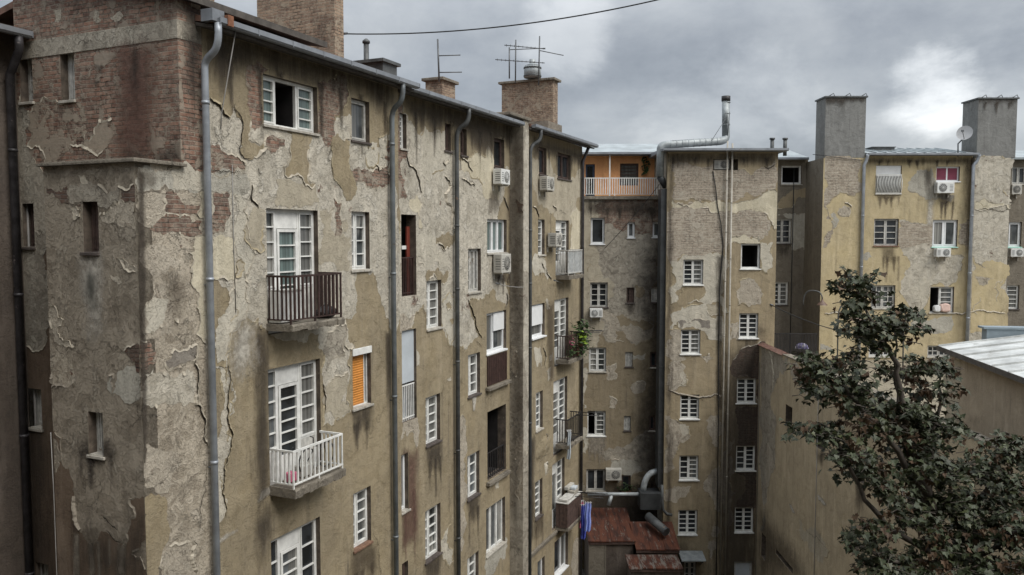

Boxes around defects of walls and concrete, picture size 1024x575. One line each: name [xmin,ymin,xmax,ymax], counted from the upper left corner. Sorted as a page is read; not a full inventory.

flaking render [17,88,117,388]
flaking render [78,41,510,523]
crack [407,130,476,250]
flaking render [510,129,815,533]
flaking render [823,156,862,248]
water stain [927,195,953,224]
flaking render [898,155,1014,334]
crack [190,355,234,573]
water stain [354,408,370,442]
water stain [428,444,441,473]